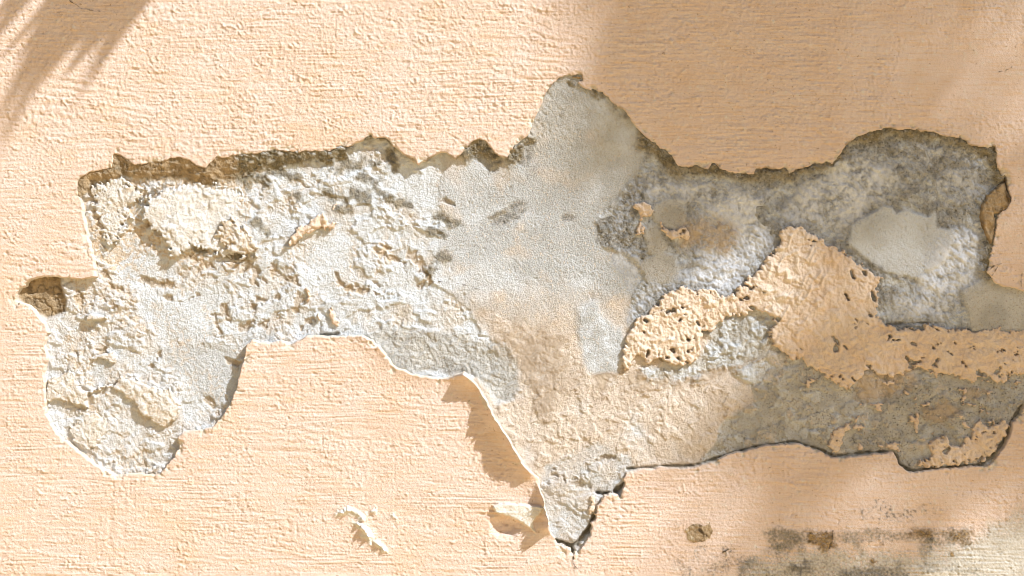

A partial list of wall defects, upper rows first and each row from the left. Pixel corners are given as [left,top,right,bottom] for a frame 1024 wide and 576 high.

water stain [911,145,986,208]
water stain [635,155,904,293]
flaking render [18,75,1024,483]
water stain [892,222,984,325]
water stain [594,366,742,392]
peeling [334,505,397,554]
peeling [490,481,553,541]
flaking render [540,442,635,553]
flaking render [685,522,713,543]
water stain [768,530,962,550]